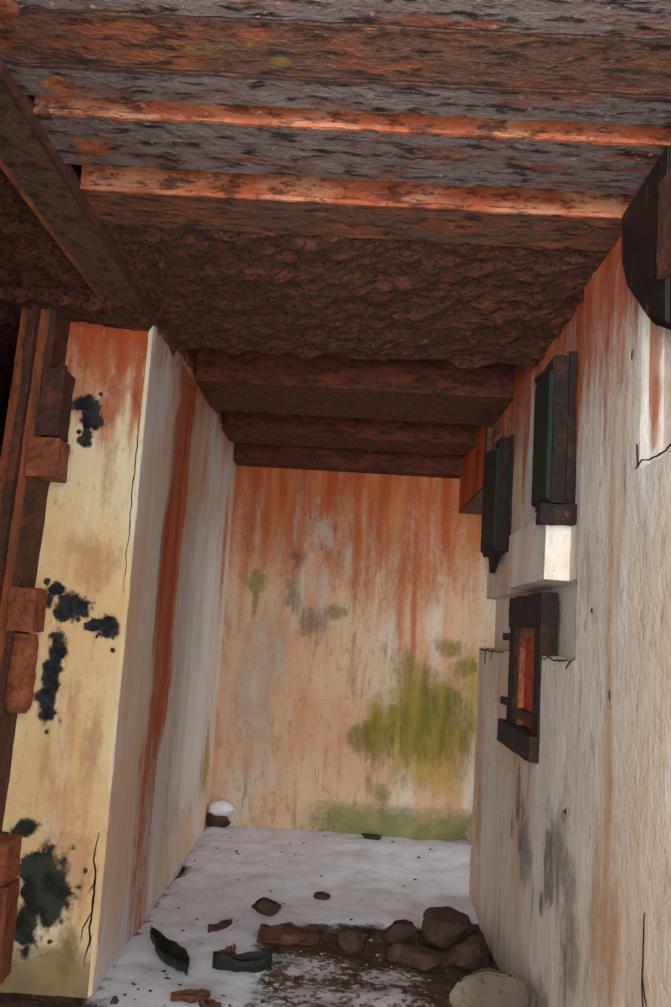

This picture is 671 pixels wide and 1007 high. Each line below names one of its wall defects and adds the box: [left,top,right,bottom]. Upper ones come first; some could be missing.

rust [222,235,638,652]
crack [634,443,671,469]
rust [649,320,660,444]
rust [137,348,204,859]
crack [640,913,648,1007]